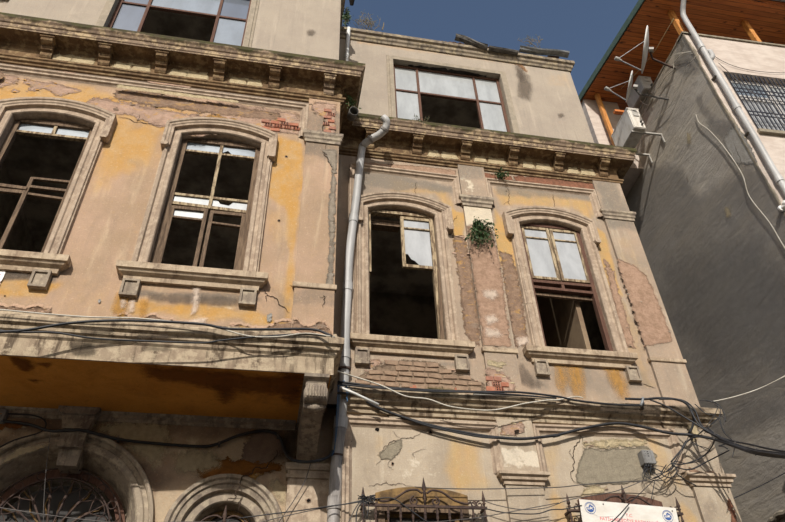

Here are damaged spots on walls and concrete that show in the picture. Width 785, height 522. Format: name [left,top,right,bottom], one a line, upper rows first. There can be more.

peeling [52,54,95,64]
peeling [112,61,150,72]
peeling [168,68,208,80]
peeling [229,77,262,87]
leakage [517,64,530,99]
flaking render [85,84,301,135]
leakage [70,326,112,354]
leakage [10,357,51,382]
leakage [146,366,304,403]
flaking render [355,359,516,391]
flaking render [582,438,648,449]
flaking render [726,499,737,522]